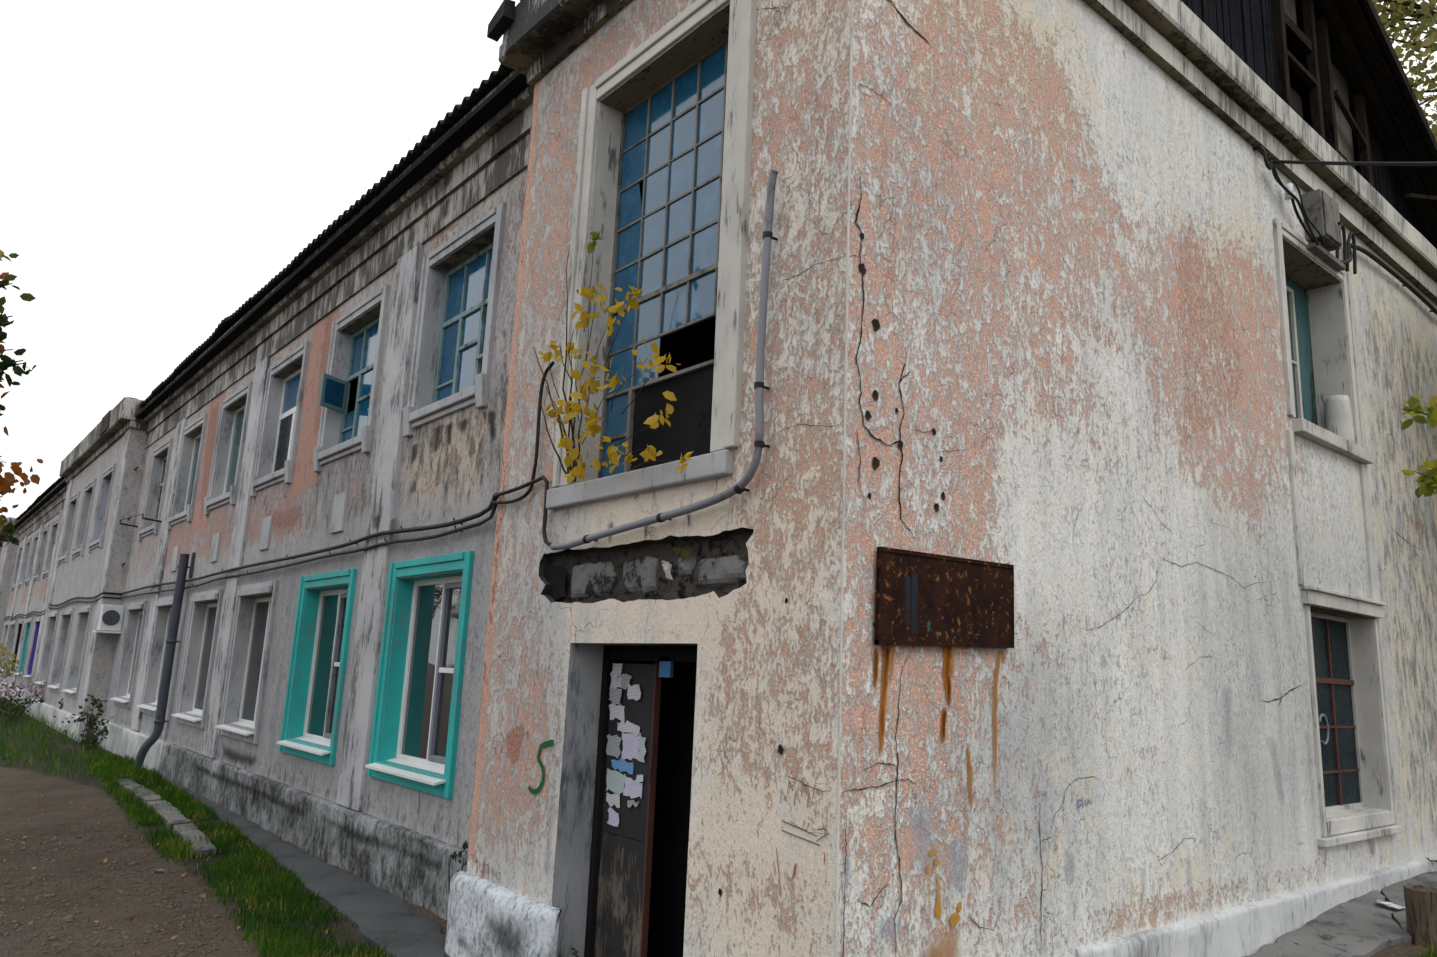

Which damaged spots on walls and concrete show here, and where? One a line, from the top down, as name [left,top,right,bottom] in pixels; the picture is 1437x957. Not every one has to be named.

crack [888,0,931,46]
crack [780,182,963,540]
spalling [539,527,754,603]
crack [1080,499,1270,630]
leakage [224,749,253,763]
leakage [197,767,302,814]
crack [785,650,916,957]
rust [874,645,895,753]
rust [941,646,955,742]
rust [993,650,1006,784]